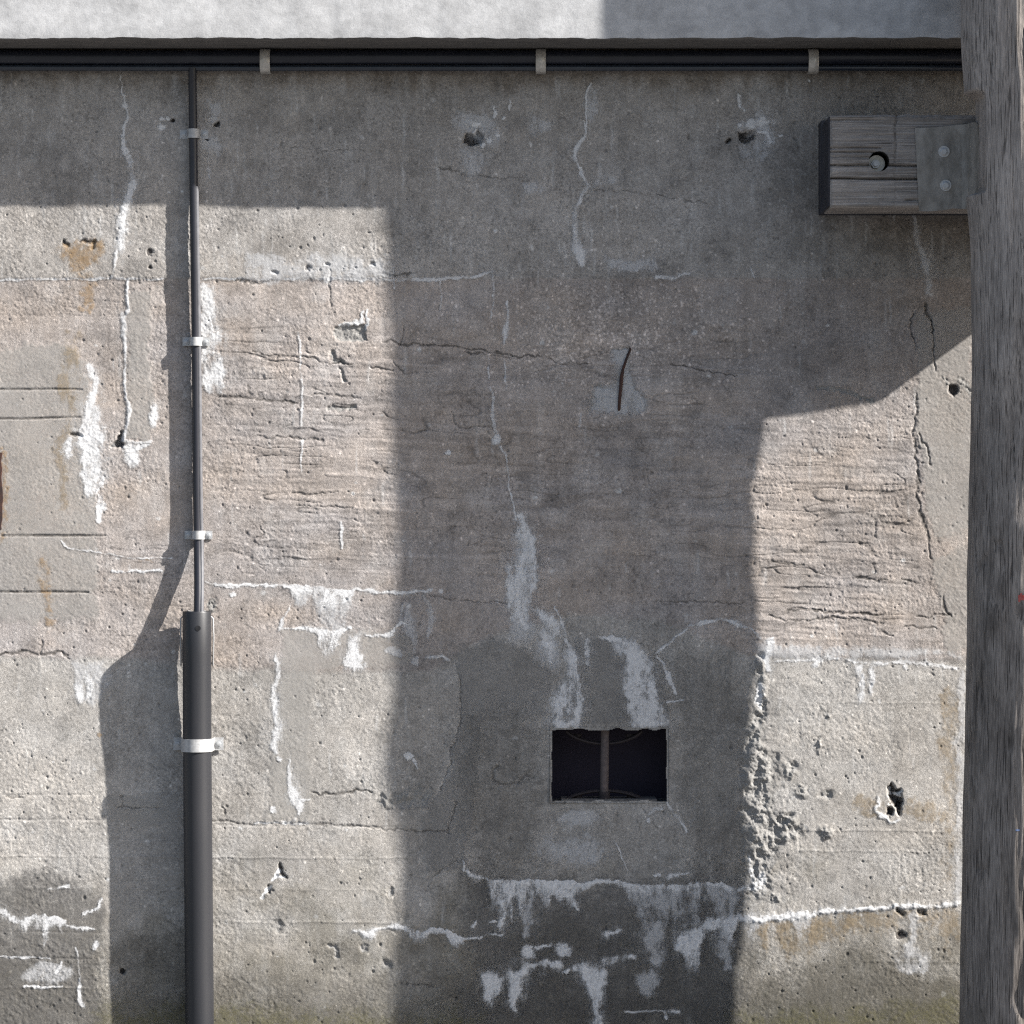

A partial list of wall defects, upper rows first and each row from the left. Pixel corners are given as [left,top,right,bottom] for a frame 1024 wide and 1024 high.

spalling [464,120,500,148]
crack [385,328,589,364]
crack [910,303,934,341]
leakage [63,363,107,524]
crack [912,397,931,559]
leakage [487,367,669,728]
leakage [205,581,450,671]
leakage [353,637,966,1024]
spalling [736,653,834,904]
spalling [874,783,903,824]
leakage [0,899,103,950]
leakage [0,955,85,1007]